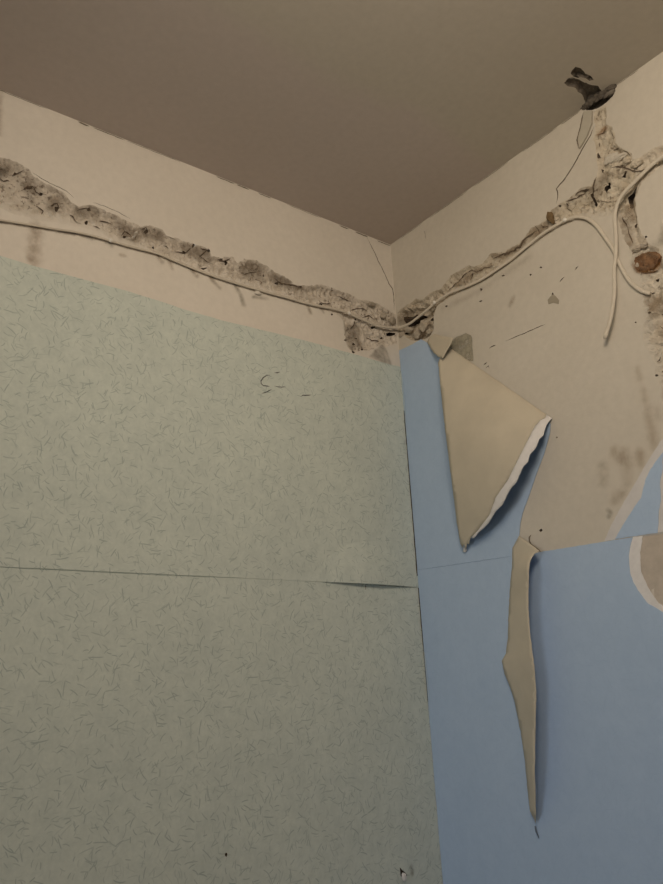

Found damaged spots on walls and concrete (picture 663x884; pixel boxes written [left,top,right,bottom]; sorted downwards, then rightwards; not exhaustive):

flaking render [0,67,663,402]